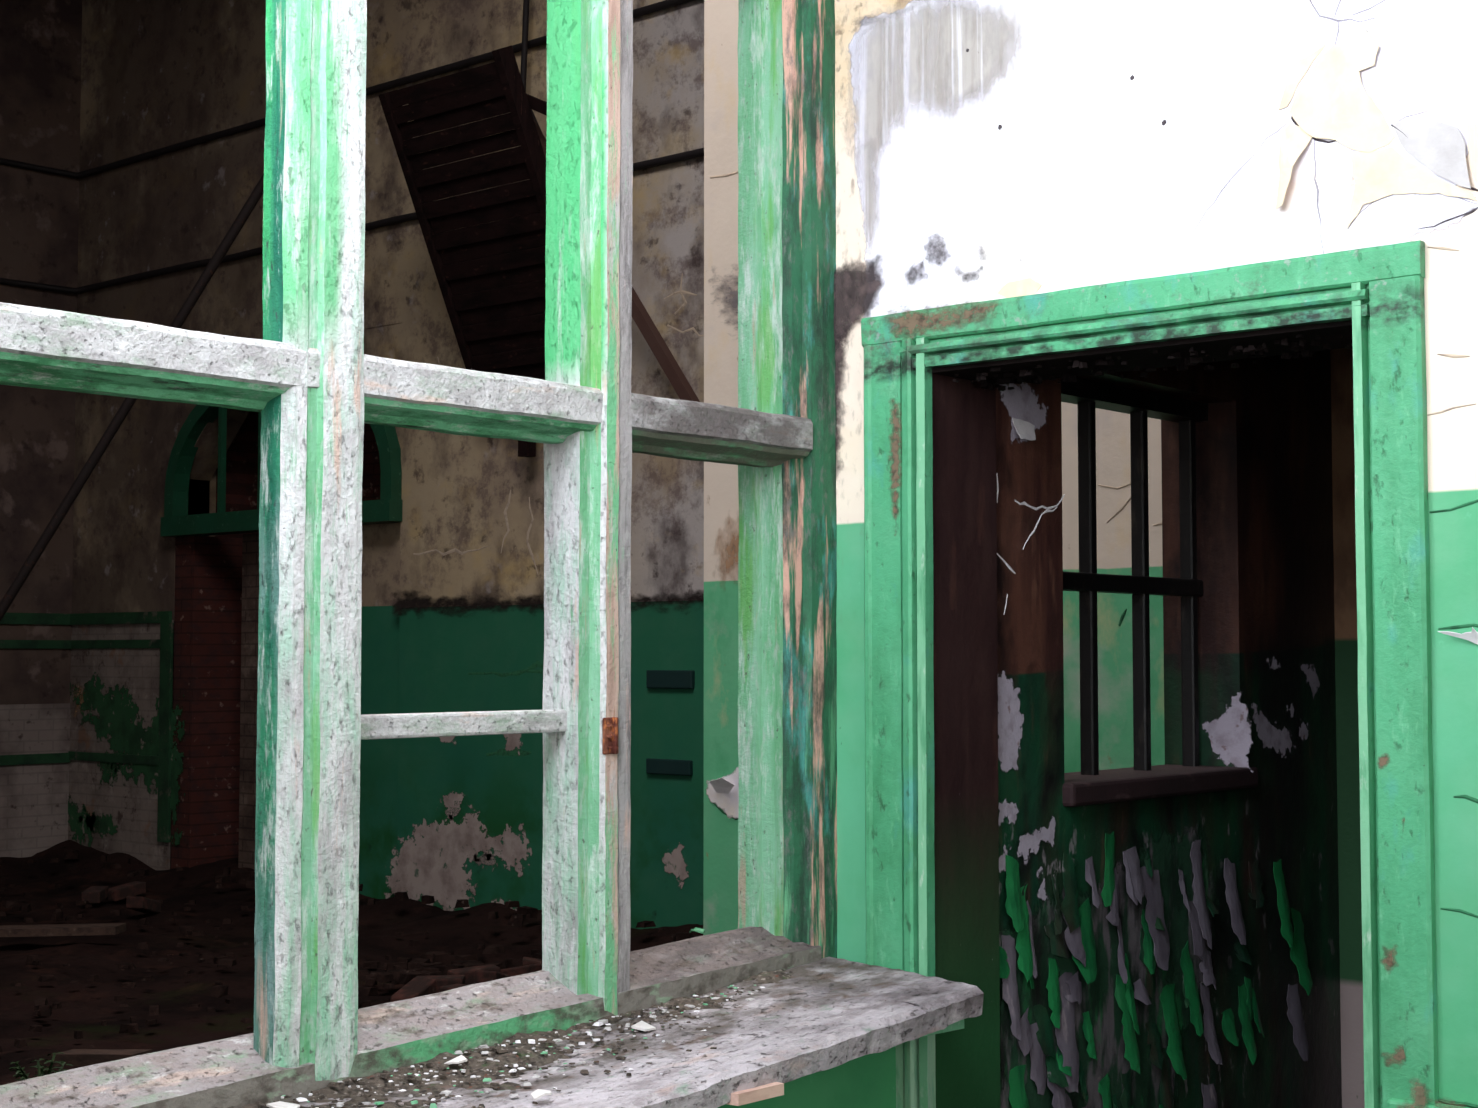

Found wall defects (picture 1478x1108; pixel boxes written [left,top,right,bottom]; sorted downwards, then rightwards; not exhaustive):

water stain [834,257,881,476]
water stain [907,237,946,283]
water stain [856,4,1013,241]
water stain [889,302,997,337]
peeling [849,0,1478,318]
crack [1187,116,1394,254]
crack [1419,187,1478,251]
crack [1427,403,1476,416]
crack [1429,499,1478,513]
peeling [1202,692,1308,773]
peeling [384,791,532,911]
peeling [998,799,1313,1108]